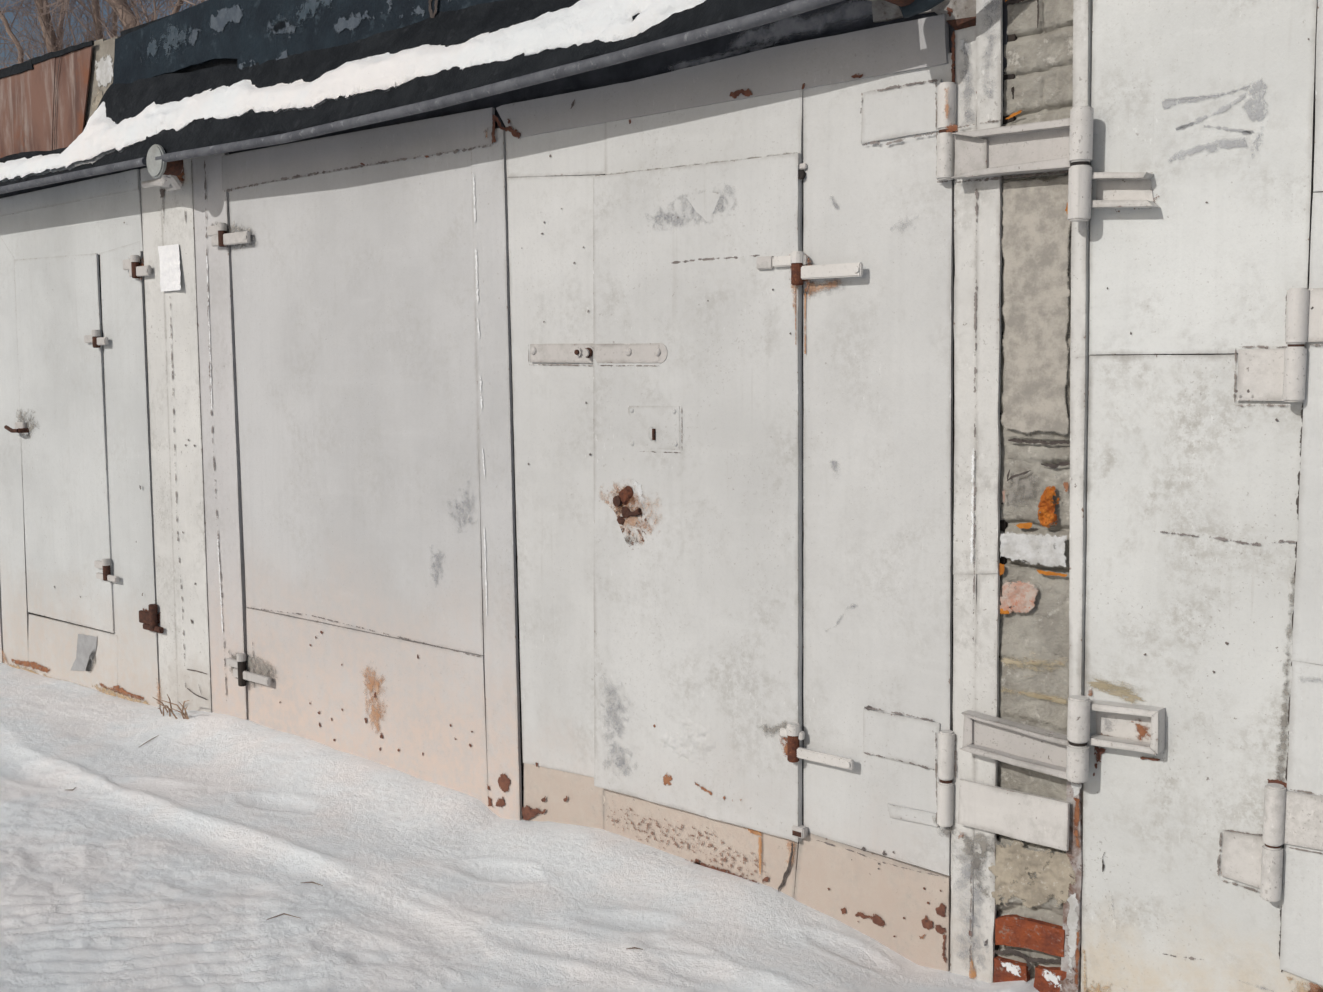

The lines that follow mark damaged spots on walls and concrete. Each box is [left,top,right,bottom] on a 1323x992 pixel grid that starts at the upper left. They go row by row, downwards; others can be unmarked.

peeling [147,4,243,60]
peeling [267,0,425,60]
rust [606,481,652,550]
rust [364,668,384,731]
rust [487,773,511,807]
rust [522,796,546,821]
rust [608,805,769,884]
rust [841,907,895,937]
rust [919,887,947,963]
rust [1288,979,1323,992]